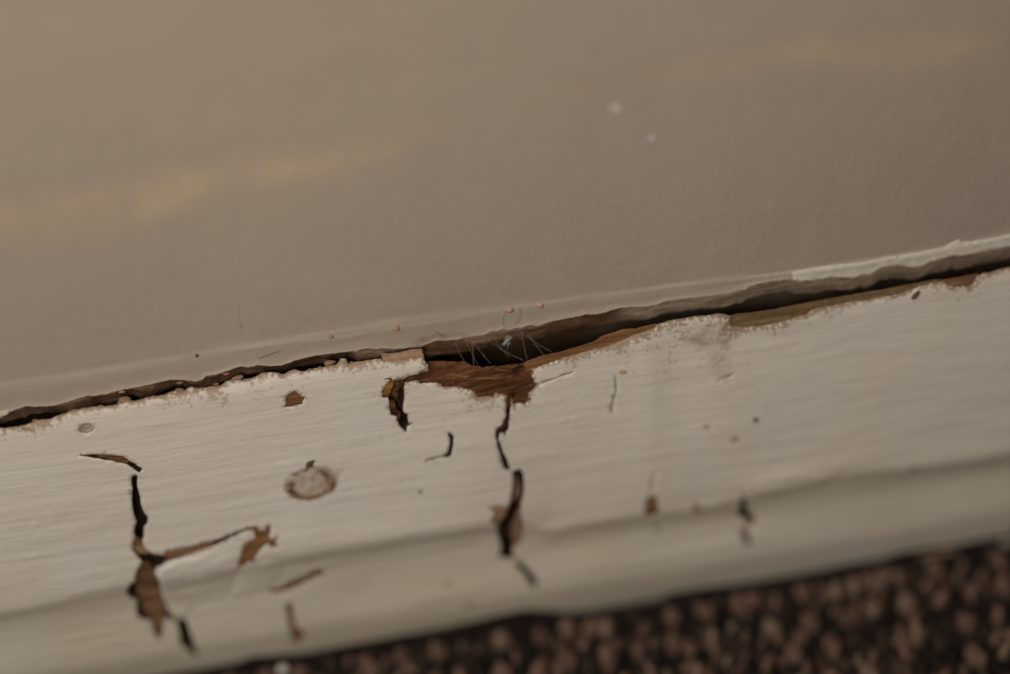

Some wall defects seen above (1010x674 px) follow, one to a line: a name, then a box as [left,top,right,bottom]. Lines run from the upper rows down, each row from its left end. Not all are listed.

crack [0,247,1010,432]
peeling [524,324,656,374]
crack [88,454,246,655]
crack [432,433,454,459]
crack [492,393,537,586]
crack [739,493,755,545]